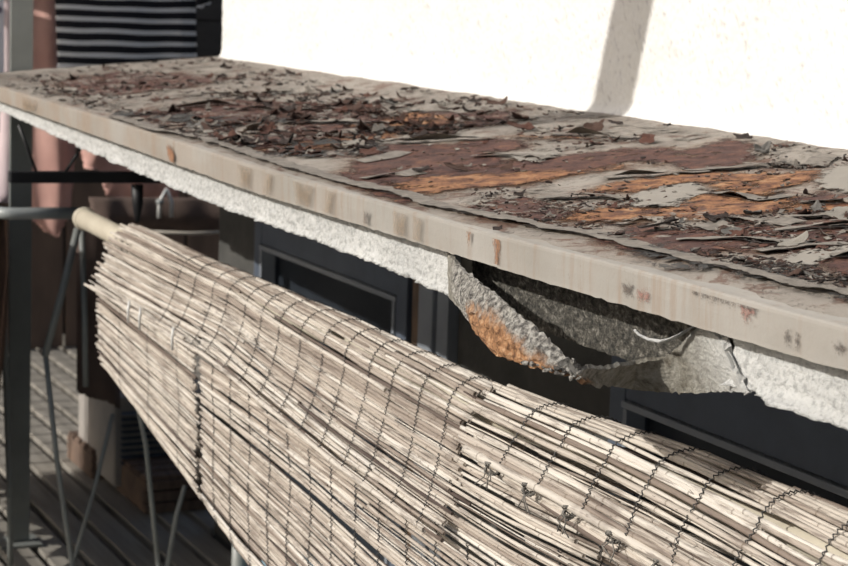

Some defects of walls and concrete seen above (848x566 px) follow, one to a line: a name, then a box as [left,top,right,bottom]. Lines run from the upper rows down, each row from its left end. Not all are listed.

peeling [0,57,718,170]
rust [136,99,848,284]
peeling [464,133,848,288]
peeling [447,252,752,395]